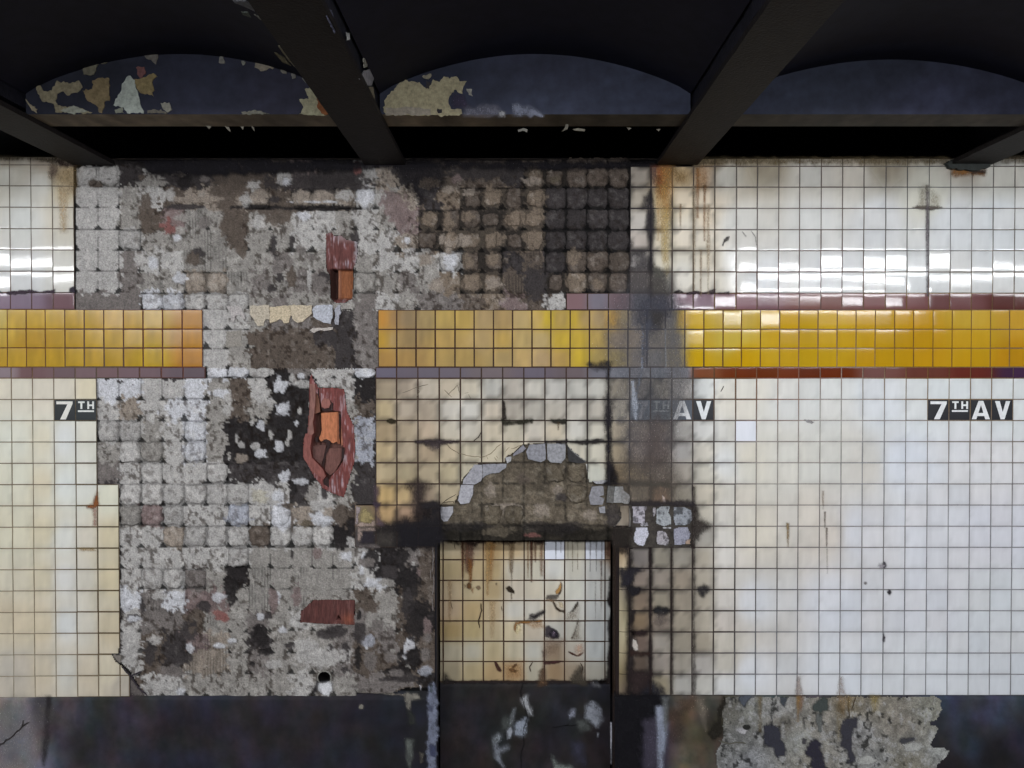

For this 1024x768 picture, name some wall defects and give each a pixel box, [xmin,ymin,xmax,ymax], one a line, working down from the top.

peeling [25,54,172,115]
peeling [241,45,328,116]
peeling [359,58,472,117]
peeling [225,110,268,132]
rust [653,168,709,289]
spalling [76,157,692,768]
rust [461,541,495,588]
rust [527,542,543,582]
damp [653,606,670,623]
peeling [716,695,949,768]